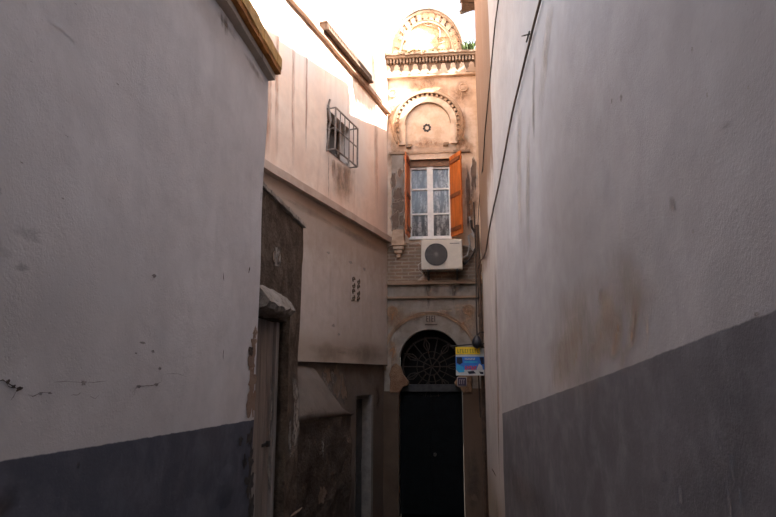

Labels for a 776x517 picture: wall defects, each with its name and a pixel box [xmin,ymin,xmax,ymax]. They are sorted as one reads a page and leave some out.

flaking render [402,23,452,53]
flaking render [389,167,405,231]
crack [0,379,103,399]
flaking render [246,325,258,418]